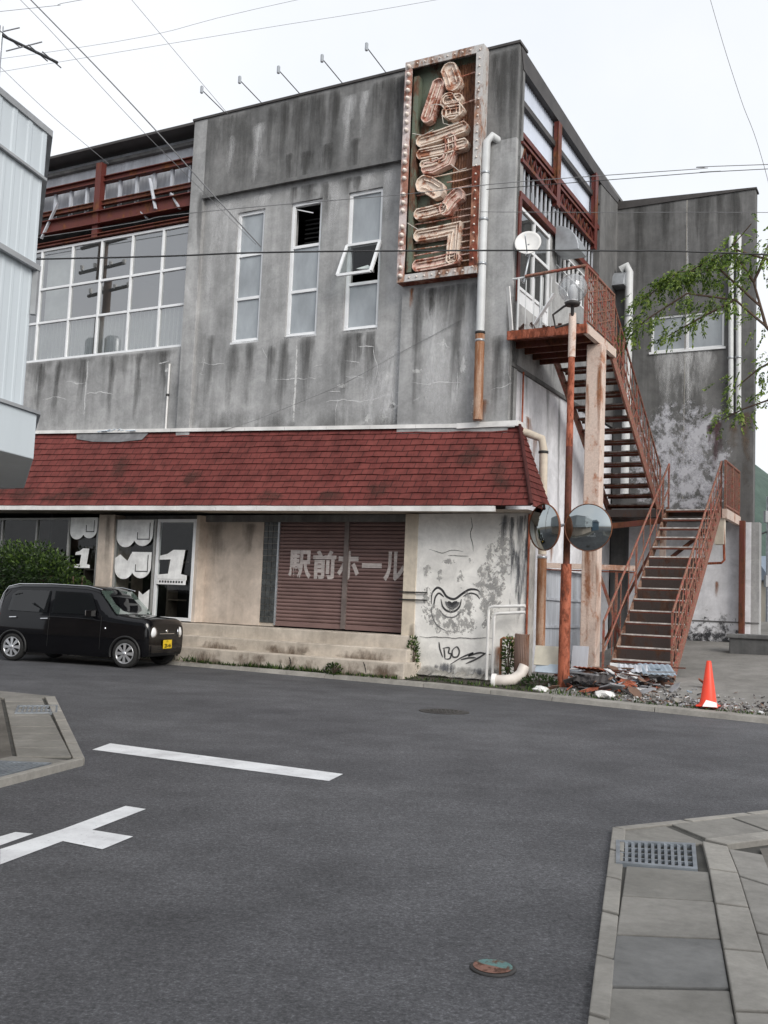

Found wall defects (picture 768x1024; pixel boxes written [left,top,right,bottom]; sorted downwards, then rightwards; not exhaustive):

leakage [271,341,310,420]
peeling [630,402,730,509]
peeling [421,527,514,634]